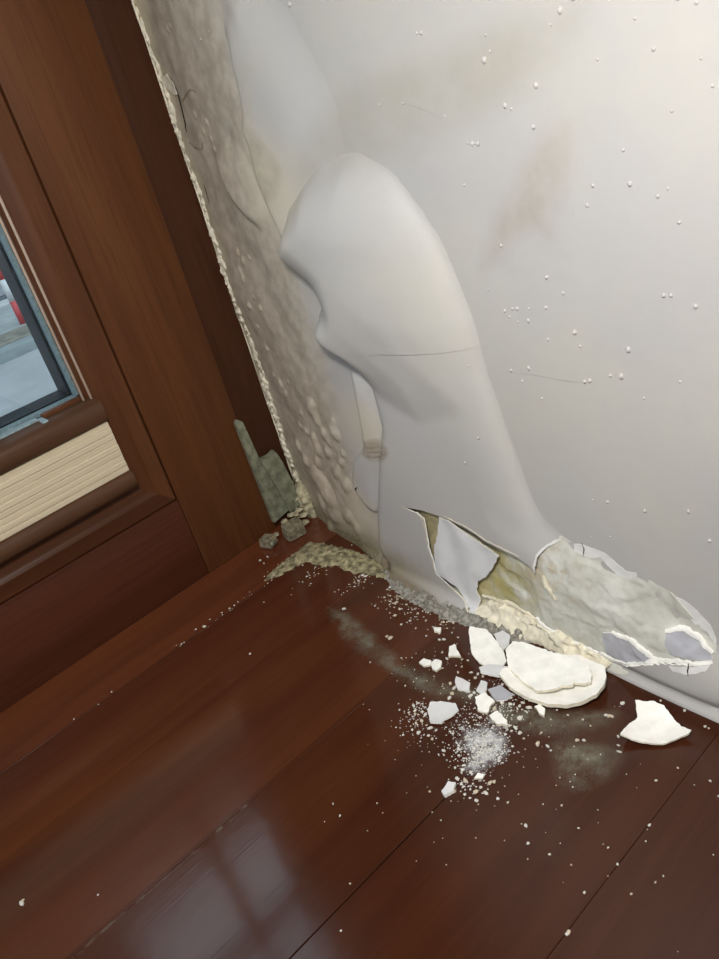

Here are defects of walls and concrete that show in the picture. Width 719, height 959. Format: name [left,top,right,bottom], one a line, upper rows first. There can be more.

spalling [131,0,361,537]
spalling [264,509,717,675]
peeling [455,664,514,702]